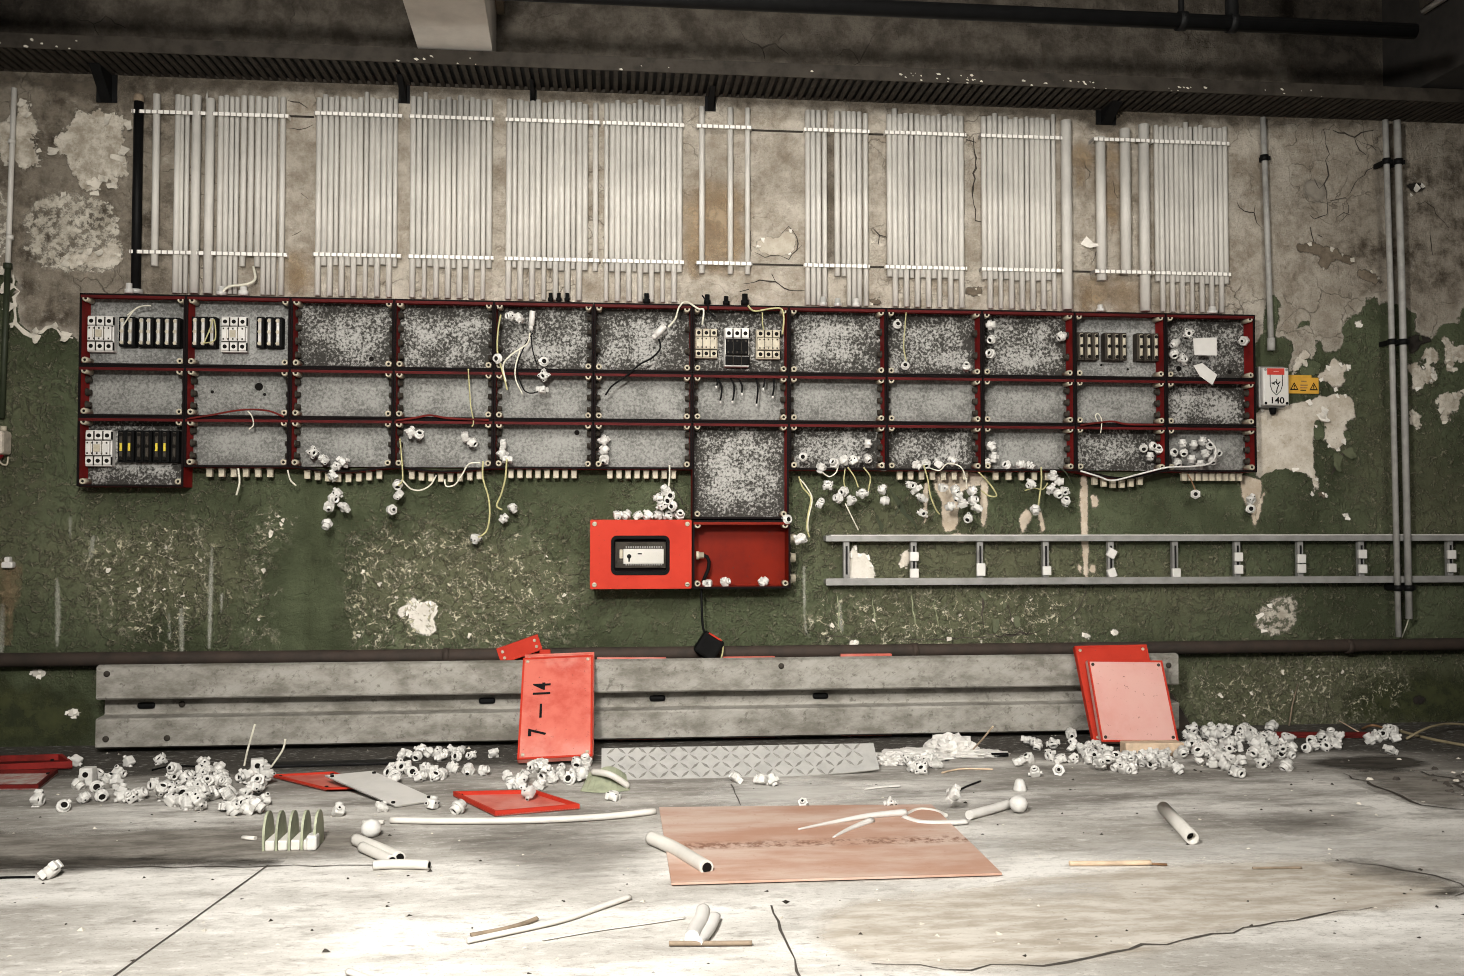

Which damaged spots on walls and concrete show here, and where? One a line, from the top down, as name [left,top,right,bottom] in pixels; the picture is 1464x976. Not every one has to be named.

peeling [0,98,132,343]
crack [1310,129,1376,242]
crack [1416,184,1455,255]
peeling [1407,335,1464,430]
peeling [1254,349,1357,499]
peeling [397,598,438,636]
peeling [1255,594,1298,636]
crack [1344,771,1464,810]
crack [1341,859,1464,896]
crack [871,907,1372,971]